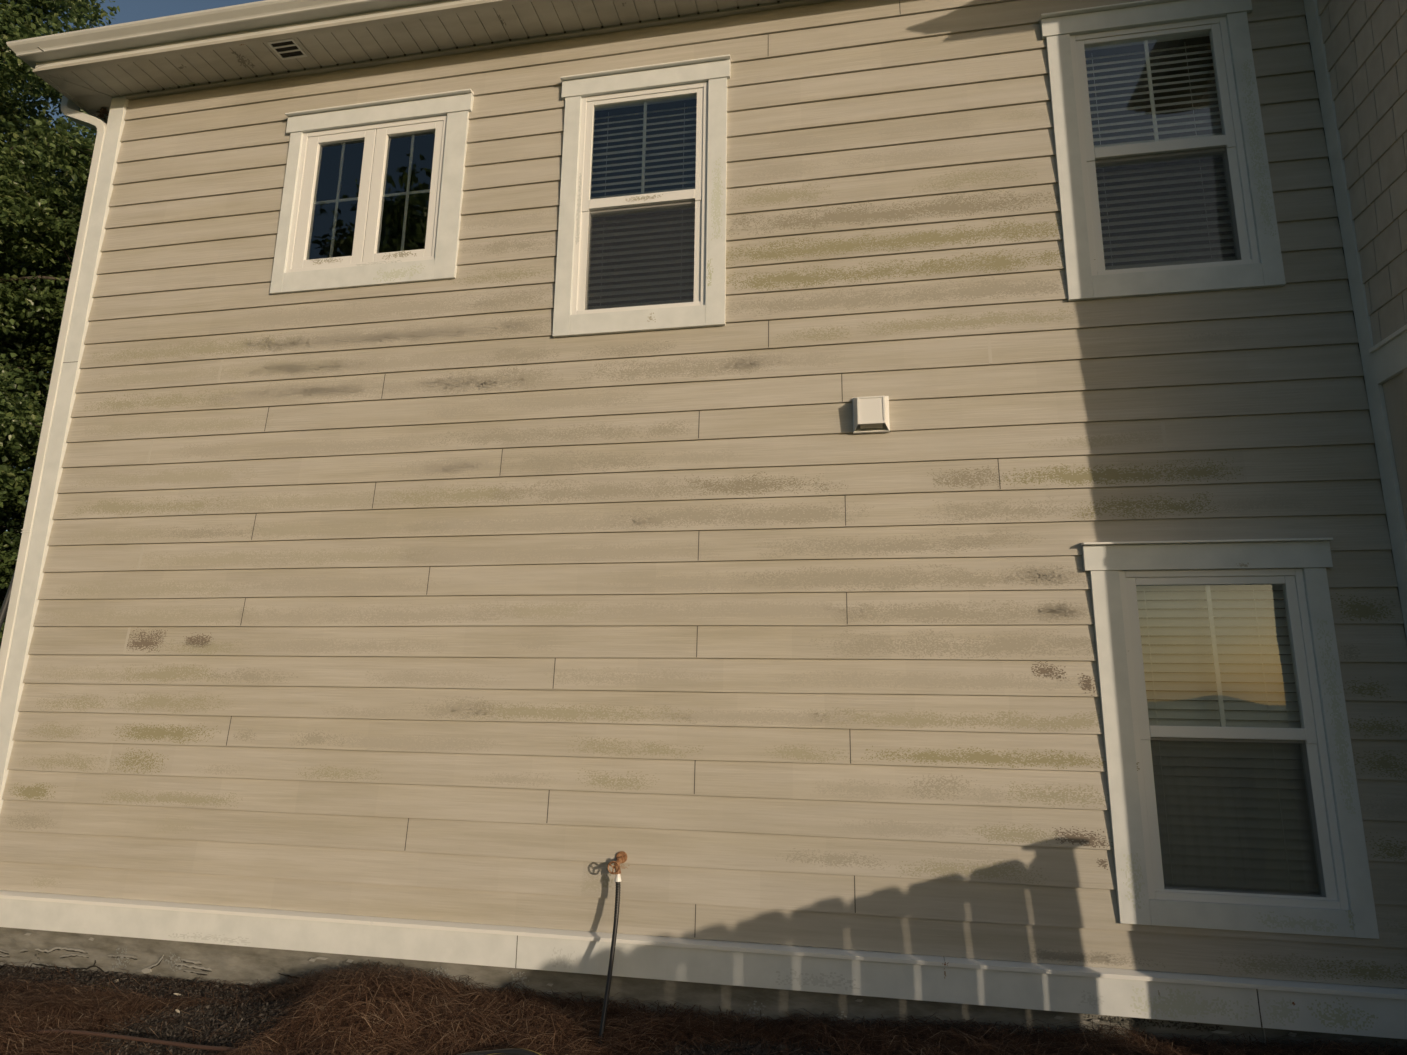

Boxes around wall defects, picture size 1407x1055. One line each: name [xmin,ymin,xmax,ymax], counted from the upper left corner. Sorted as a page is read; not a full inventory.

mould [726,190,1059,237]
water stain [123,627,214,653]
water stain [1052,826,1113,870]
mould [1017,947,1165,968]